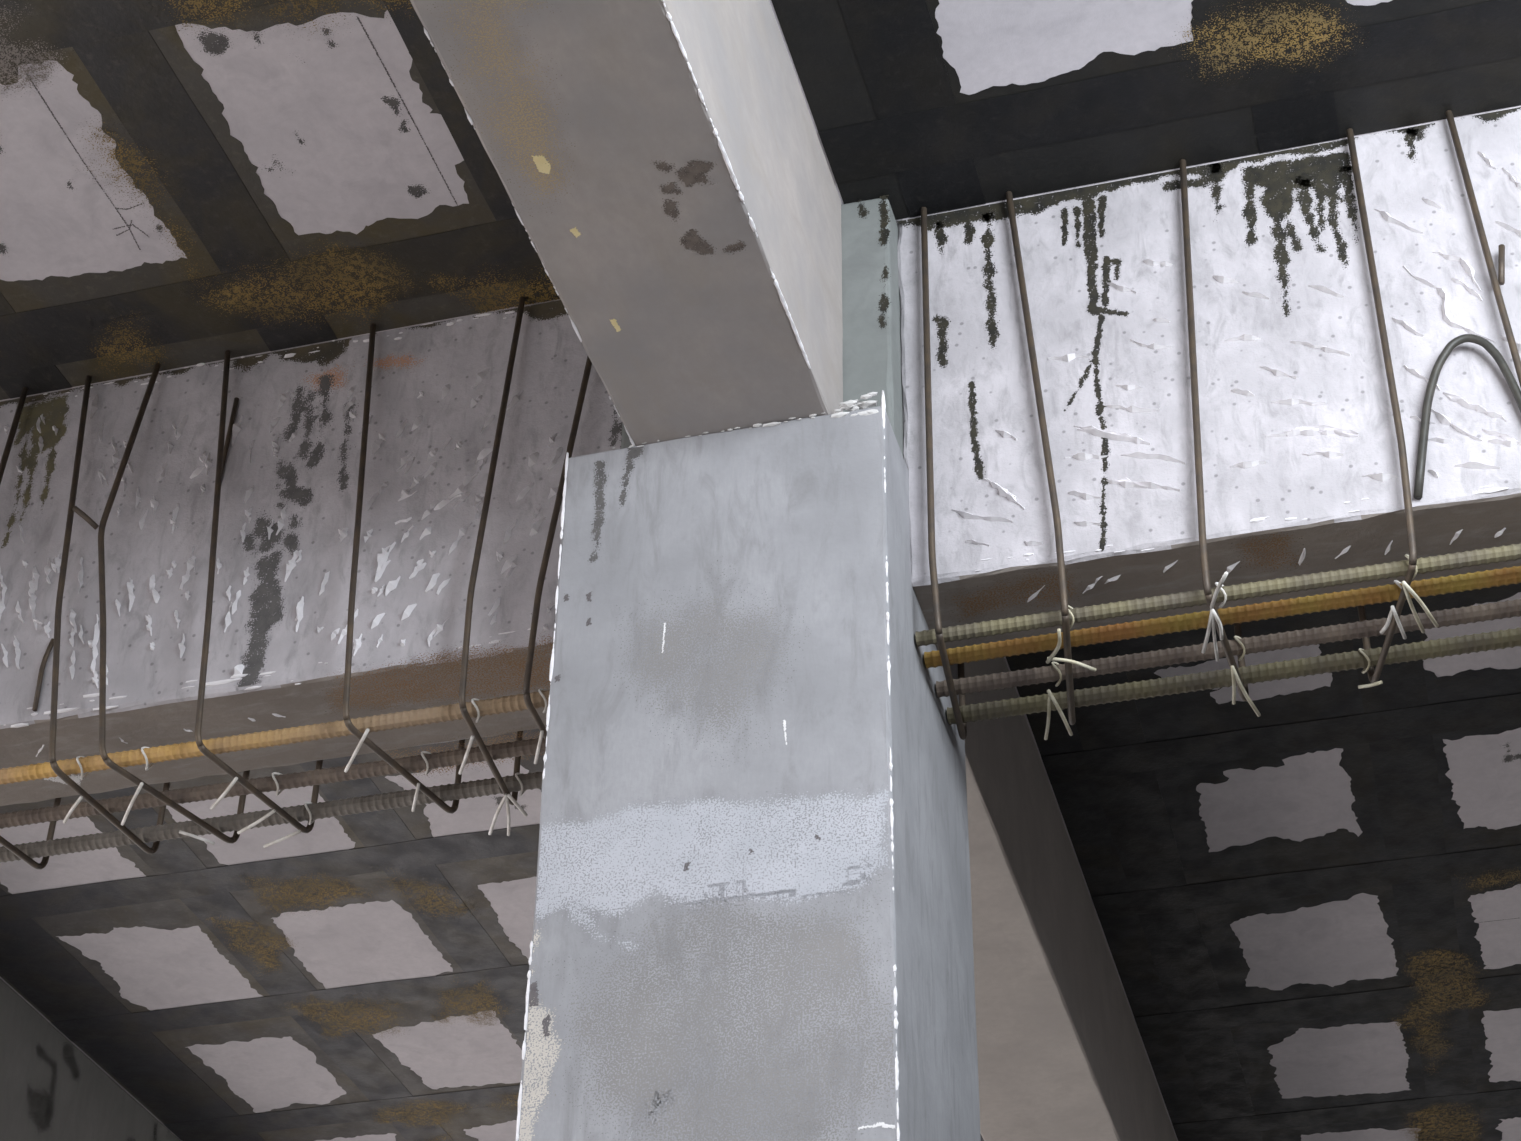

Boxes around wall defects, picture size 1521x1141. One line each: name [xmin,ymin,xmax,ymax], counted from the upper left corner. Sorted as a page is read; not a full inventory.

leakage [1168,0,1370,86]
leakage [381,95,410,133]
leakage [1457,107,1521,124]
leakage [856,137,1360,551]
spalling [1403,252,1521,353]
leakage [0,114,568,687]
spalling [295,369,523,656]
spalling [0,433,592,863]
rust [322,636,553,715]
rust [950,566,1083,622]
spalling [915,539,1521,725]
rust [386,728,544,779]